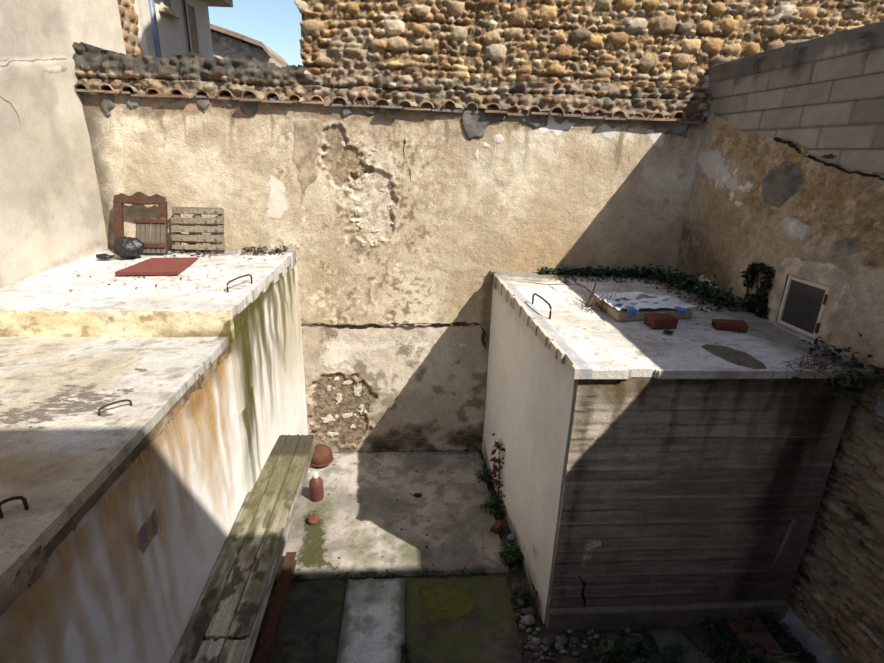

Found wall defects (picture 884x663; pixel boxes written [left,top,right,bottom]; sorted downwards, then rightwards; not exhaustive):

crack [0,58,68,66]
peeling [265,175,288,219]
peeling [323,127,396,247]
peeling [696,148,753,207]
crack [773,137,884,181]
crack [311,322,486,349]
water stain [224,266,295,457]
flaking render [308,374,377,449]
crack [578,575,586,608]